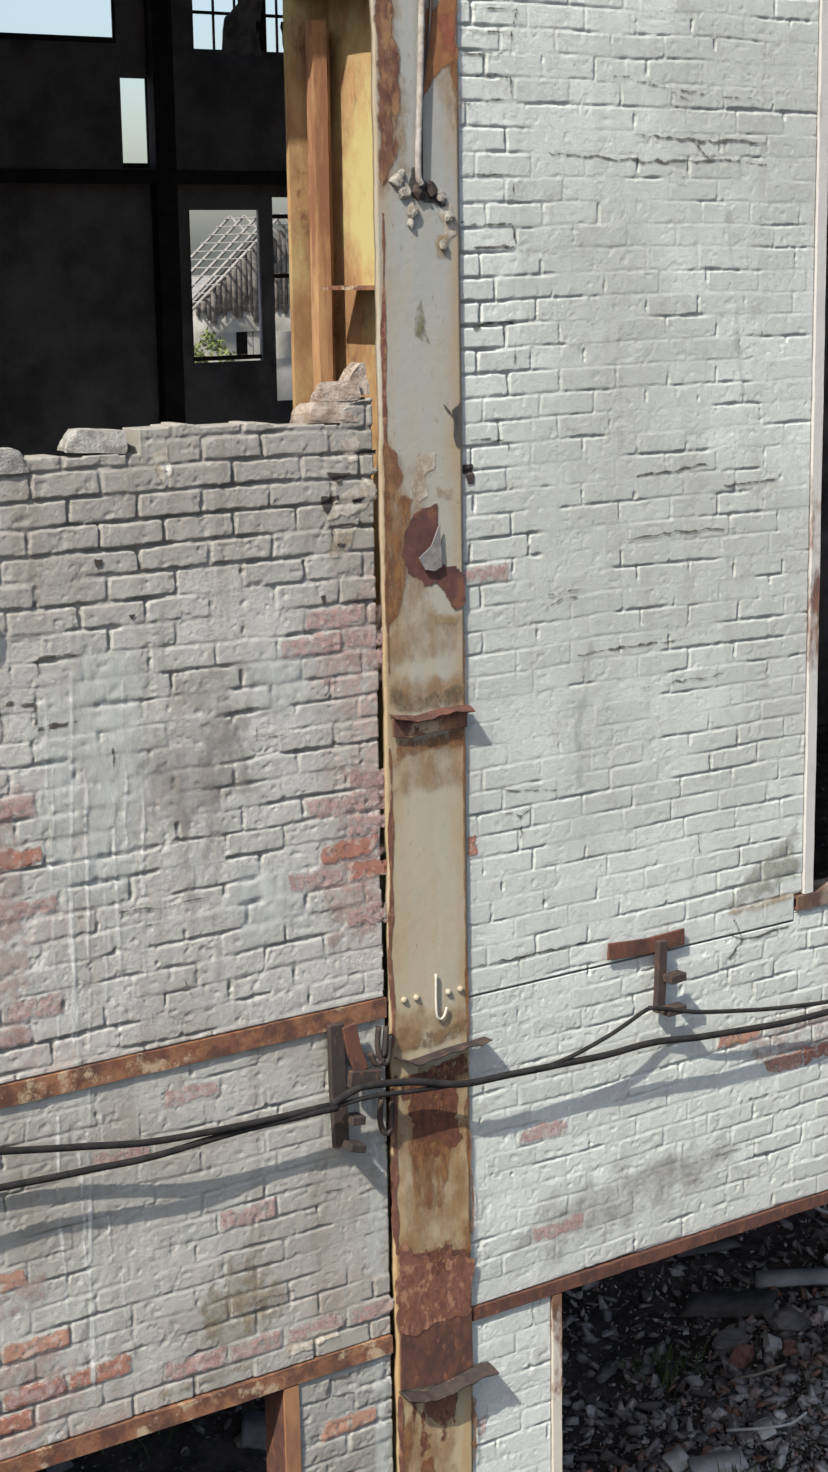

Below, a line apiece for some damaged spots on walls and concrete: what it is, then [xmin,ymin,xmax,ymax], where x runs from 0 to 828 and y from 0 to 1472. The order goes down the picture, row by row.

rust [423,0,458,96]
rust [374,0,400,185]
crack [550,134,767,166]
crack [637,463,776,487]
crack [633,528,733,540]
peeling [282,595,383,668]
peeling [289,768,387,891]
rust [387,727,475,1337]
peeling [764,1041,828,1072]
peeling [0,1329,70,1364]
peeling [0,1352,131,1437]
rust [397,1392,477,1472]